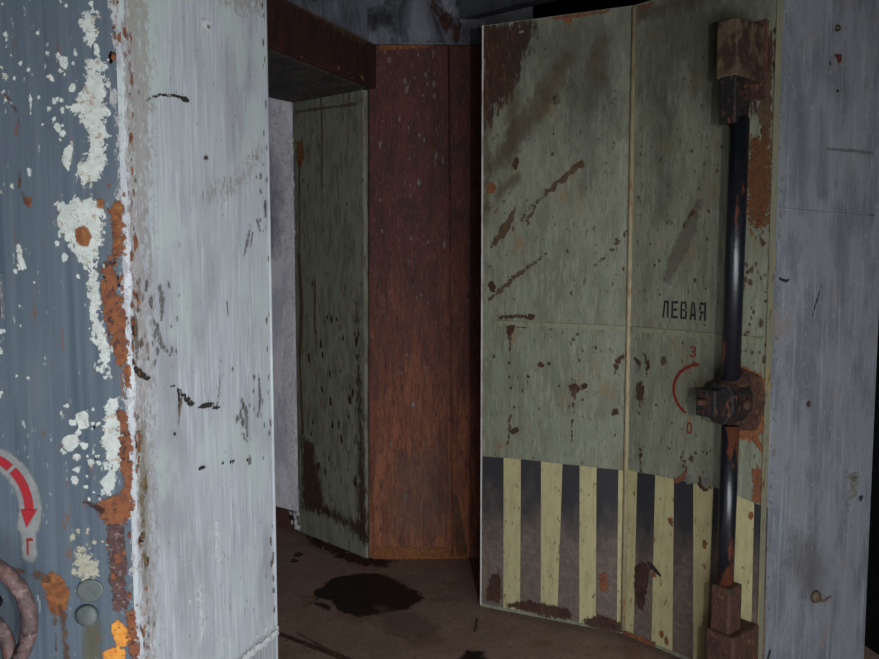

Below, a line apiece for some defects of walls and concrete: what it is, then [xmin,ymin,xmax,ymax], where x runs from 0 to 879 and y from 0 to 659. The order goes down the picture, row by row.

rust [430,0,467,43]
rust [483,20,538,131]
rust [746,28,776,247]
peeling [41,0,113,380]
rust [487,160,585,248]
peeling [13,244,27,274]
rust [296,140,467,568]
rust [83,408,156,659]
damp [308,573,423,617]
damp [460,650,488,659]
rust [506,599,572,620]
rust [582,614,656,646]